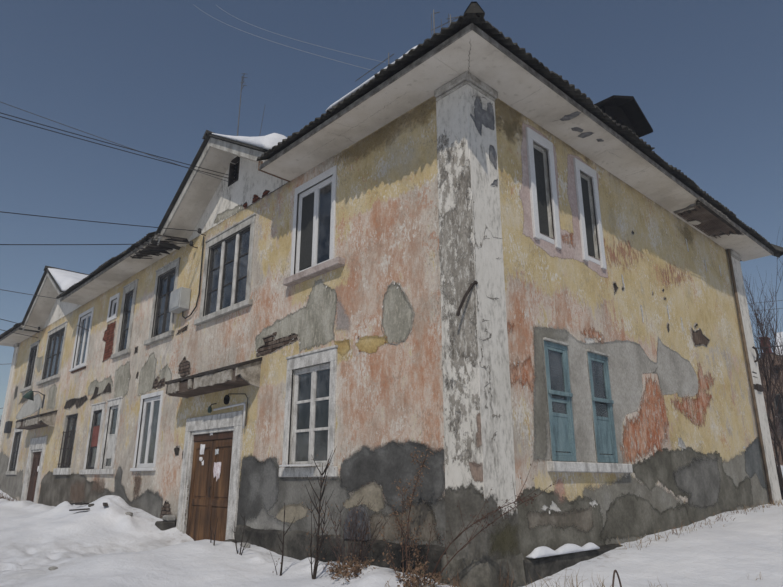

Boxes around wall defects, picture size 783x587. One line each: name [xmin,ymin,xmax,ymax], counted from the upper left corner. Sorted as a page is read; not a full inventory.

peeling [469,95,495,137]
peeling [560,111,604,142]
peeling [488,144,498,188]
spalling [674,197,744,238]
spalling [102,321,116,362]
peeling [255,279,415,357]
spalling [681,318,710,347]
peeling [16,352,191,420]
peeling [509,326,715,464]
water stain [0,452,23,501]
water stain [38,466,163,518]
water stain [236,437,769,564]